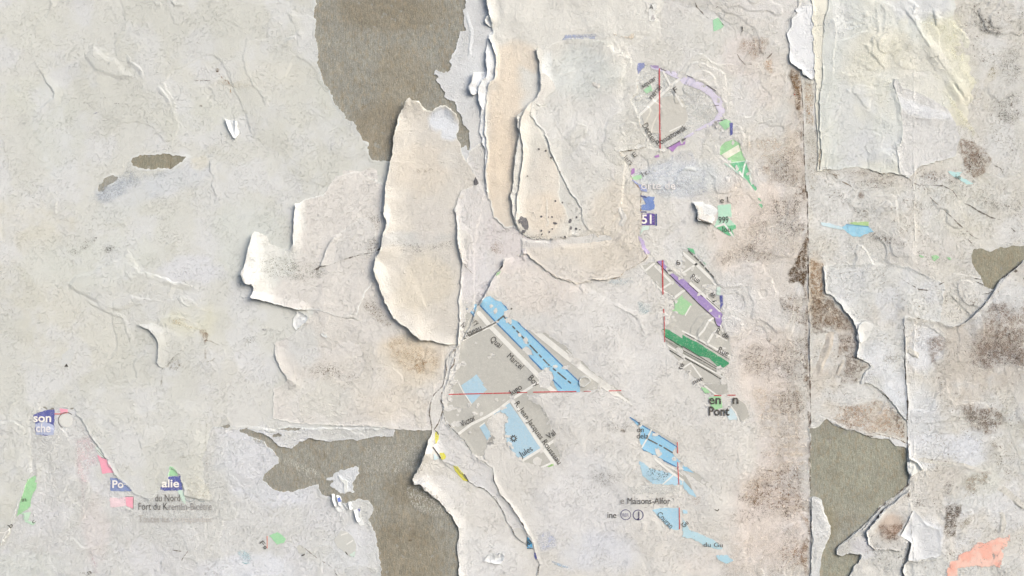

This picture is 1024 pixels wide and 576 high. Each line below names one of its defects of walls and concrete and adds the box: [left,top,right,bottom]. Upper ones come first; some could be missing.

peeling [98,175,118,192]
peeling [131,153,185,170]
peeling [240,0,479,345]
peeling [971,246,1024,289]
peeling [239,428,459,576]
peeling [809,419,923,576]